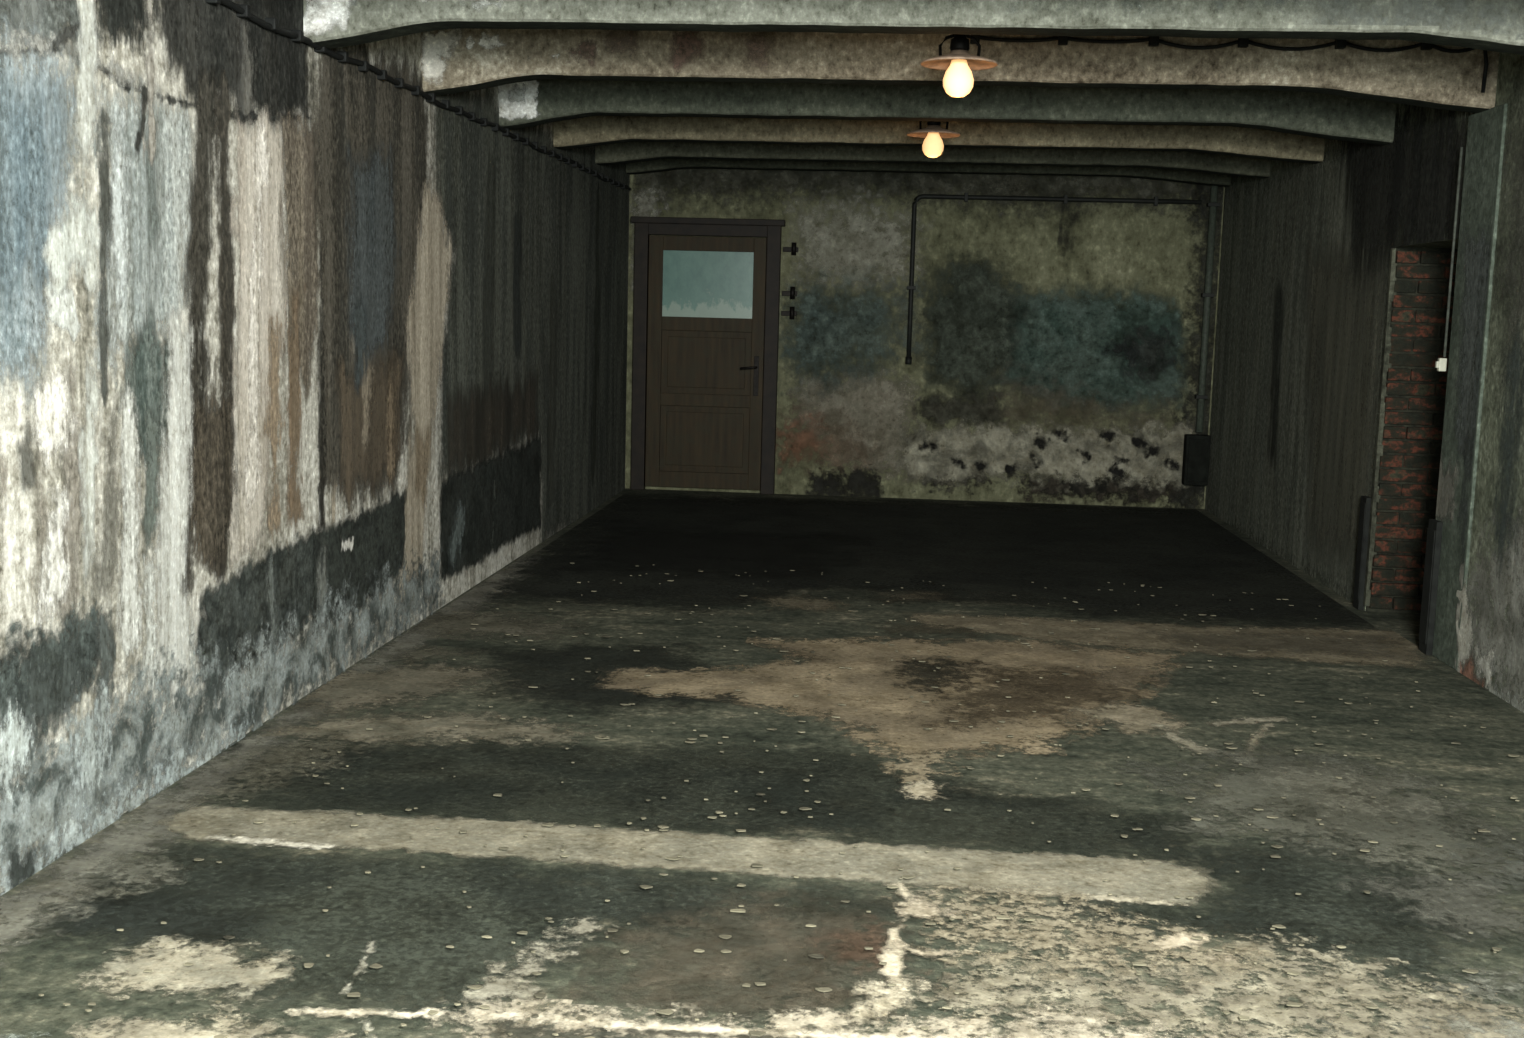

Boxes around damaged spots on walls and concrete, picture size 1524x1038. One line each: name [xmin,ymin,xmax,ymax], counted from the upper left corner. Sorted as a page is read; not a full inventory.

peeling [630,188,668,291]
peeling [785,187,924,294]
water stain [0,0,1391,896]
spalling [786,364,1193,493]
water stain [1455,230,1524,705]
water stain [213,738,1507,985]